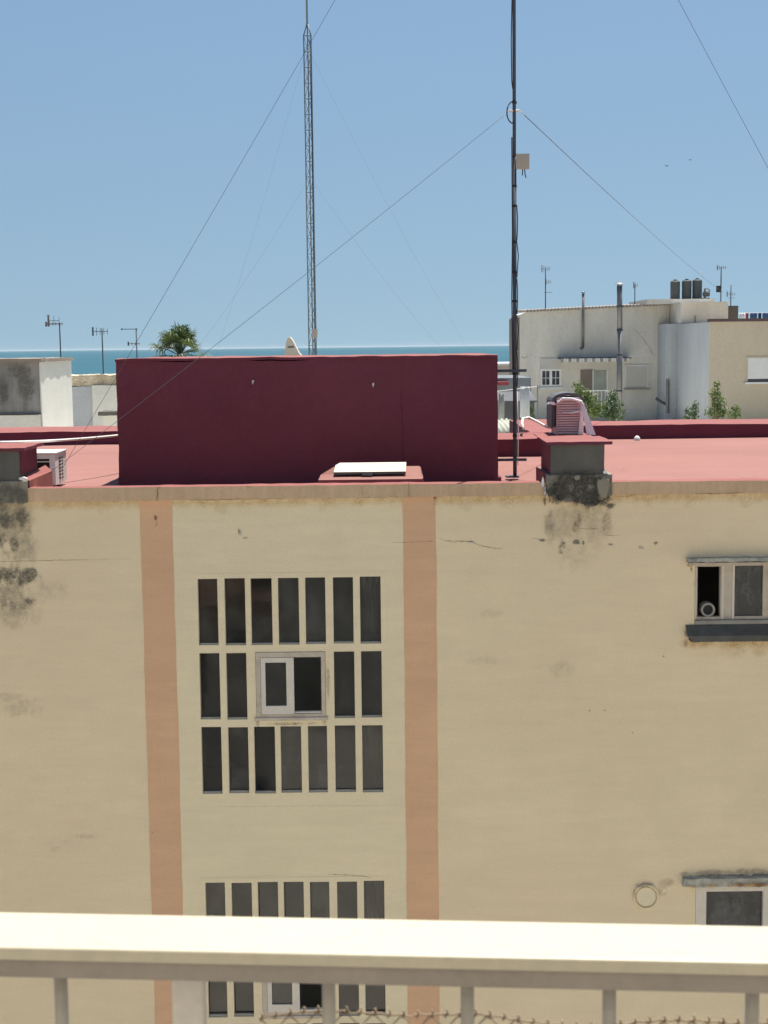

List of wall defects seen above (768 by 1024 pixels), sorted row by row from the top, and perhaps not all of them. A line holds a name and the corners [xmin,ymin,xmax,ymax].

mould [0,486,26,527]
mould [0,568,37,604]